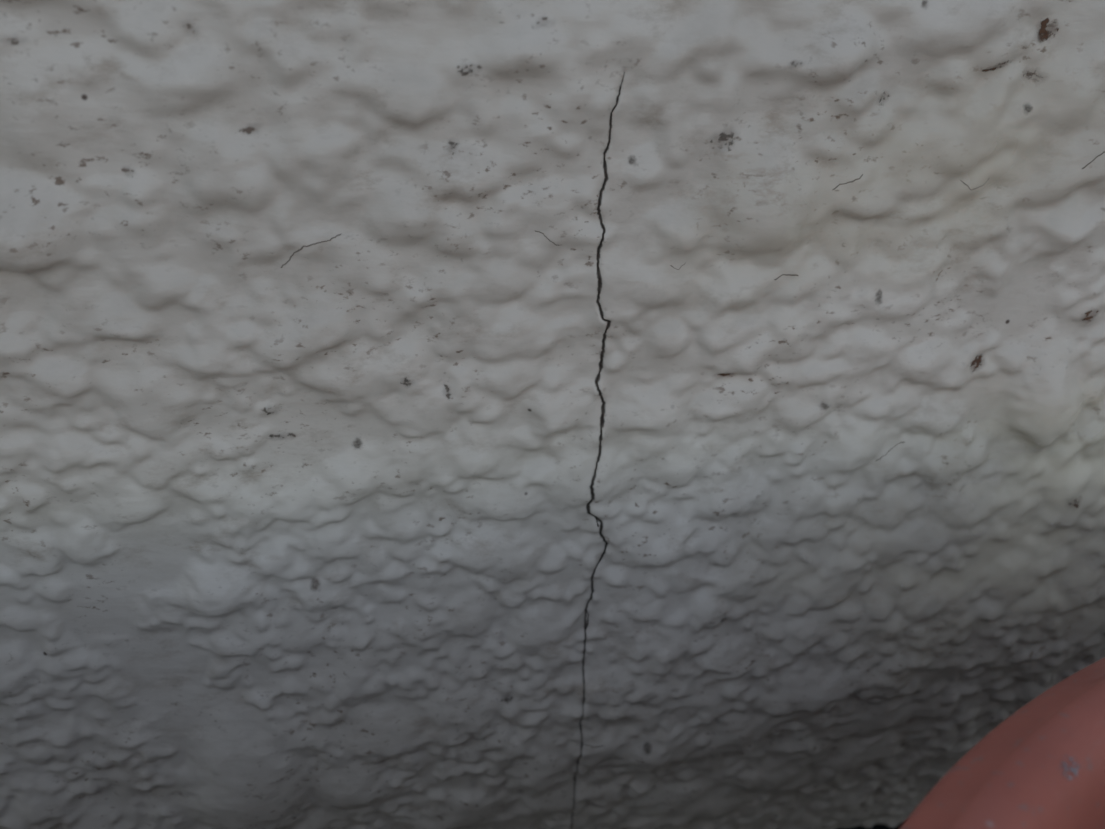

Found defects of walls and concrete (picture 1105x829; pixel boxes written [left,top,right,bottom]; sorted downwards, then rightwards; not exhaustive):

crack [571,72,625,829]